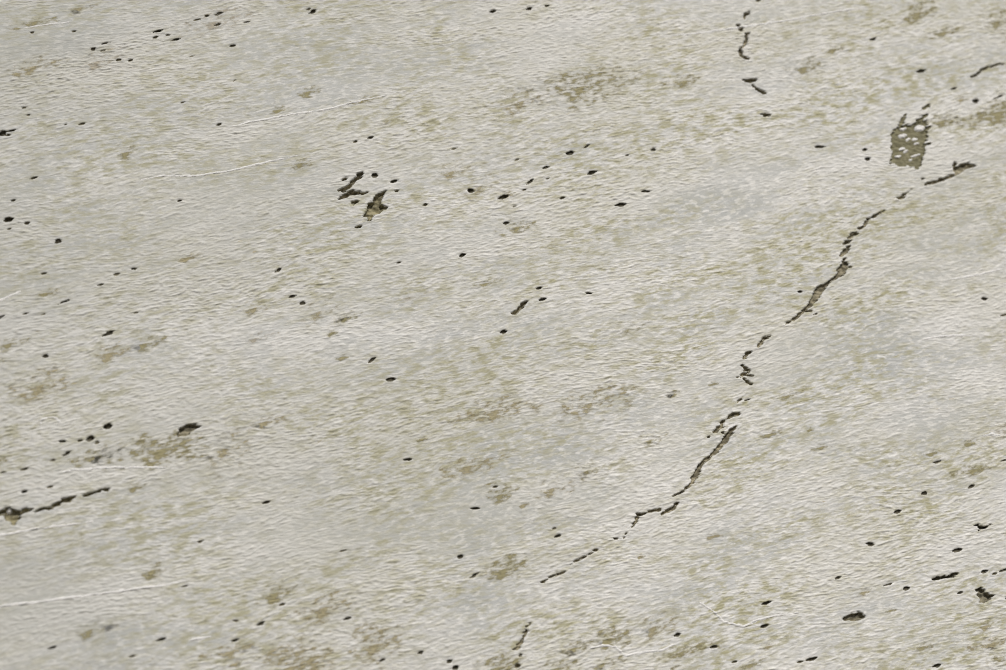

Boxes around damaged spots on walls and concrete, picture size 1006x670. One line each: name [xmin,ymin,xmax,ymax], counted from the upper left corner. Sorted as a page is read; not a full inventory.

crack [736,0,770,117]
spalling [889,104,931,170]
spalling [338,172,398,228]
crack [540,162,976,583]
crack [512,623,531,668]